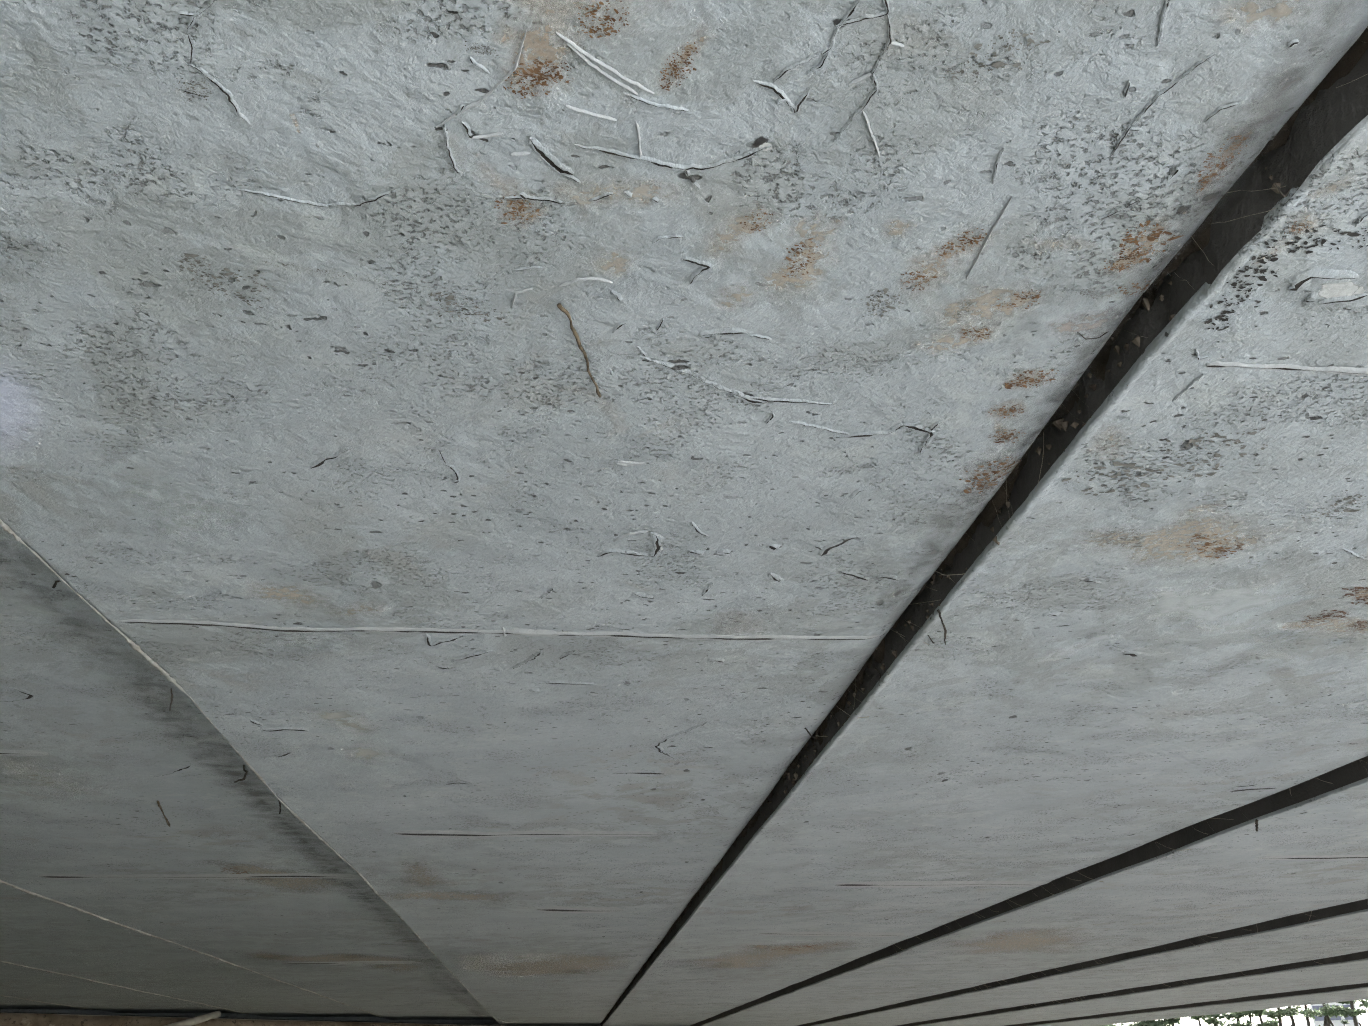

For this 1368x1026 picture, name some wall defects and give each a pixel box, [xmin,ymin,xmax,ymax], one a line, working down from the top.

rust [575,0,629,38]
crack [1156,0,1171,47]
crack [178,0,250,125]
rust [502,26,574,99]
rust [660,37,703,91]
crack [753,0,904,158]
crack [1110,53,1215,156]
rust [900,228,988,291]
rust [1057,220,1184,332]
rust [959,369,1059,494]
rust [1090,519,1256,562]
rust [1283,587,1368,633]